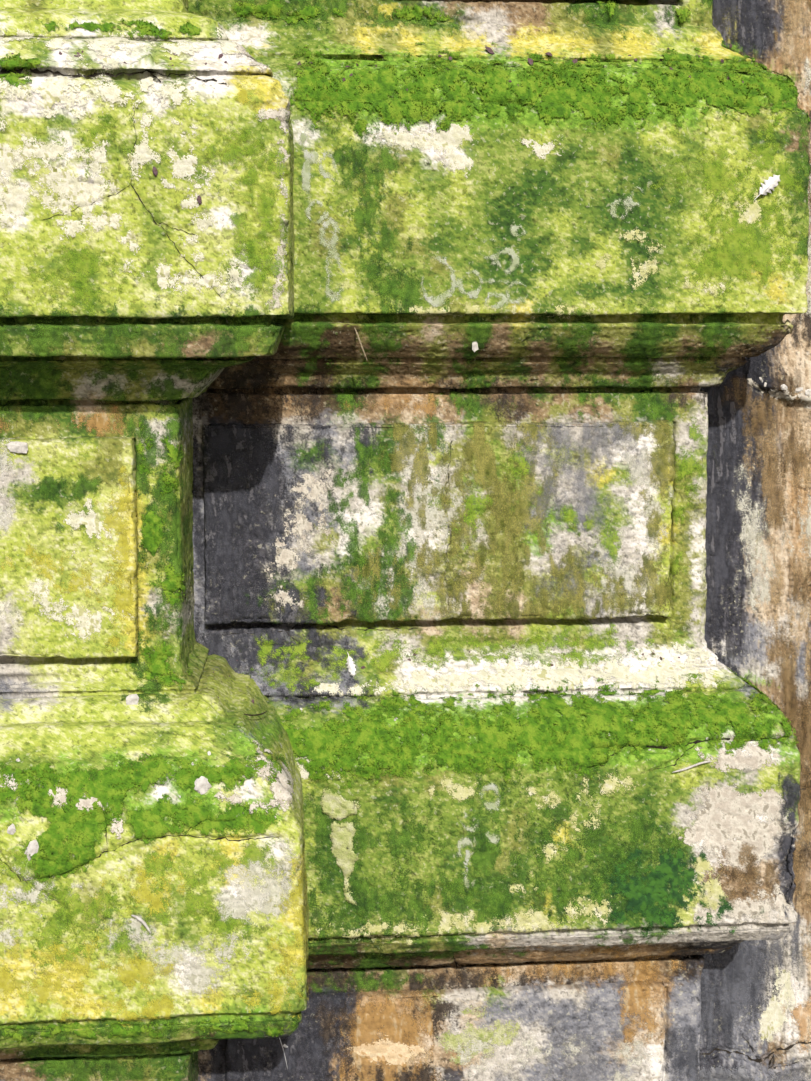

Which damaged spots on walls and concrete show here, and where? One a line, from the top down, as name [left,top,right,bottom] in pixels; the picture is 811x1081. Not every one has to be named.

crack [0,68,227,86]
damp [712,0,790,64]
crack [43,108,220,296]
damp [785,58,811,347]
damp [0,119,811,708]
crack [0,859,75,940]
crack [81,830,279,867]
damp [198,965,513,1081]
damp [409,961,616,1041]
damp [509,913,802,1081]